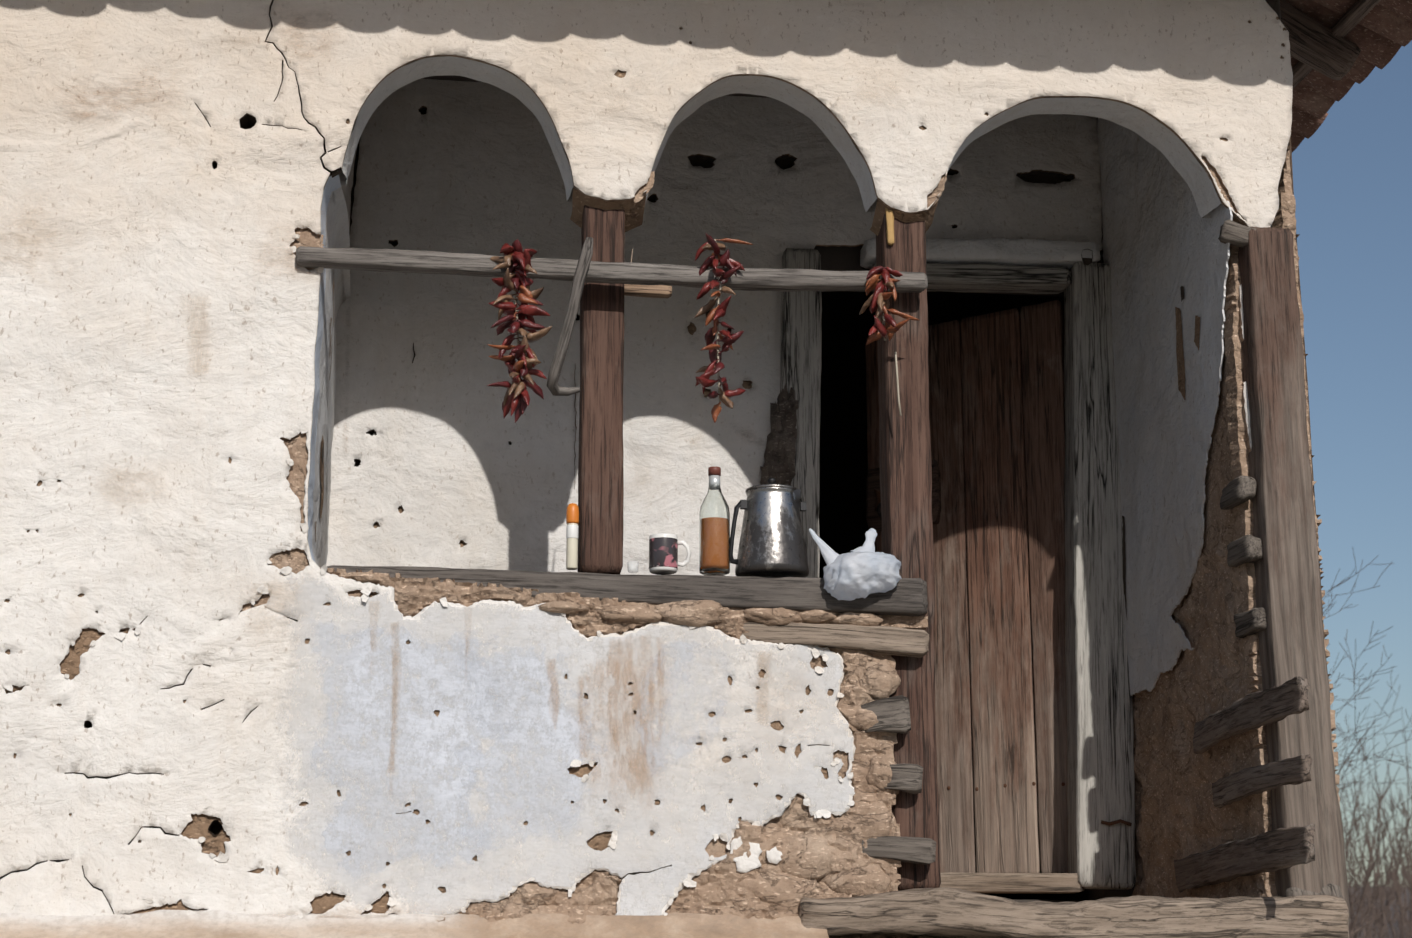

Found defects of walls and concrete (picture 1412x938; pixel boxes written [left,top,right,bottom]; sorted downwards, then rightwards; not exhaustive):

crack [262,0,362,233]
spalling [267,427,324,575]
spalling [60,611,130,680]
spalling [799,648,844,713]
crack [65,771,164,779]
spalling [567,760,598,782]
spalling [821,750,853,782]
spalling [178,814,231,862]
spalling [586,830,617,851]
flaking render [705,799,782,873]
crack [0,859,114,914]
spalling [294,883,397,918]